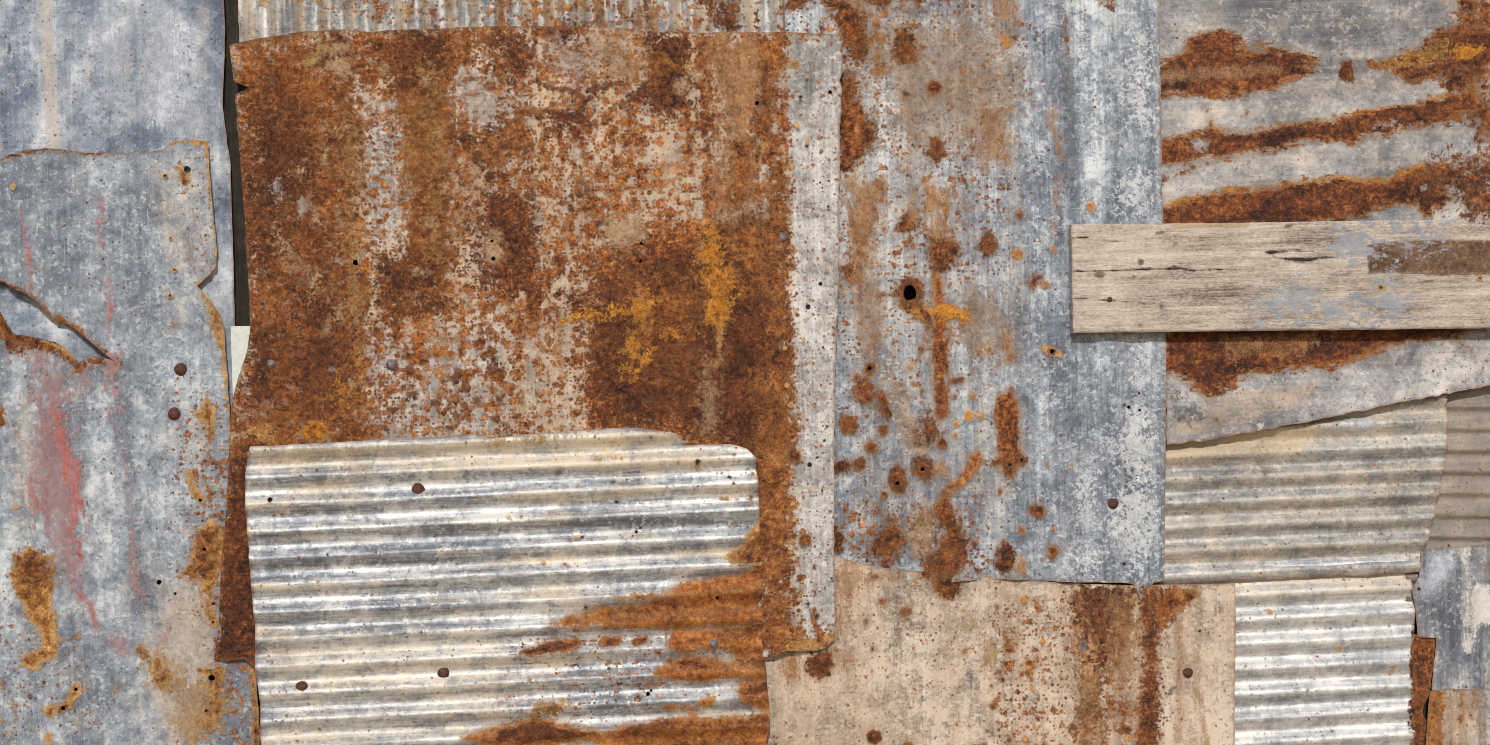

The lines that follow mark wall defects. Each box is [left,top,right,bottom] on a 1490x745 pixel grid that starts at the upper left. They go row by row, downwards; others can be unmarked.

corrosion [2,148,104,159]
corrosion [1160,0,1490,225]
corrosion [0,281,122,374]
corrosion [137,0,853,745]
corrosion [785,0,1050,601]
corrosion [1041,343,1063,358]
corrosion [1166,328,1485,421]
corrosion [1029,503,1073,559]
corrosion [5,542,62,670]
corrosion [1059,583,1207,745]
corrosion [1390,625,1485,745]